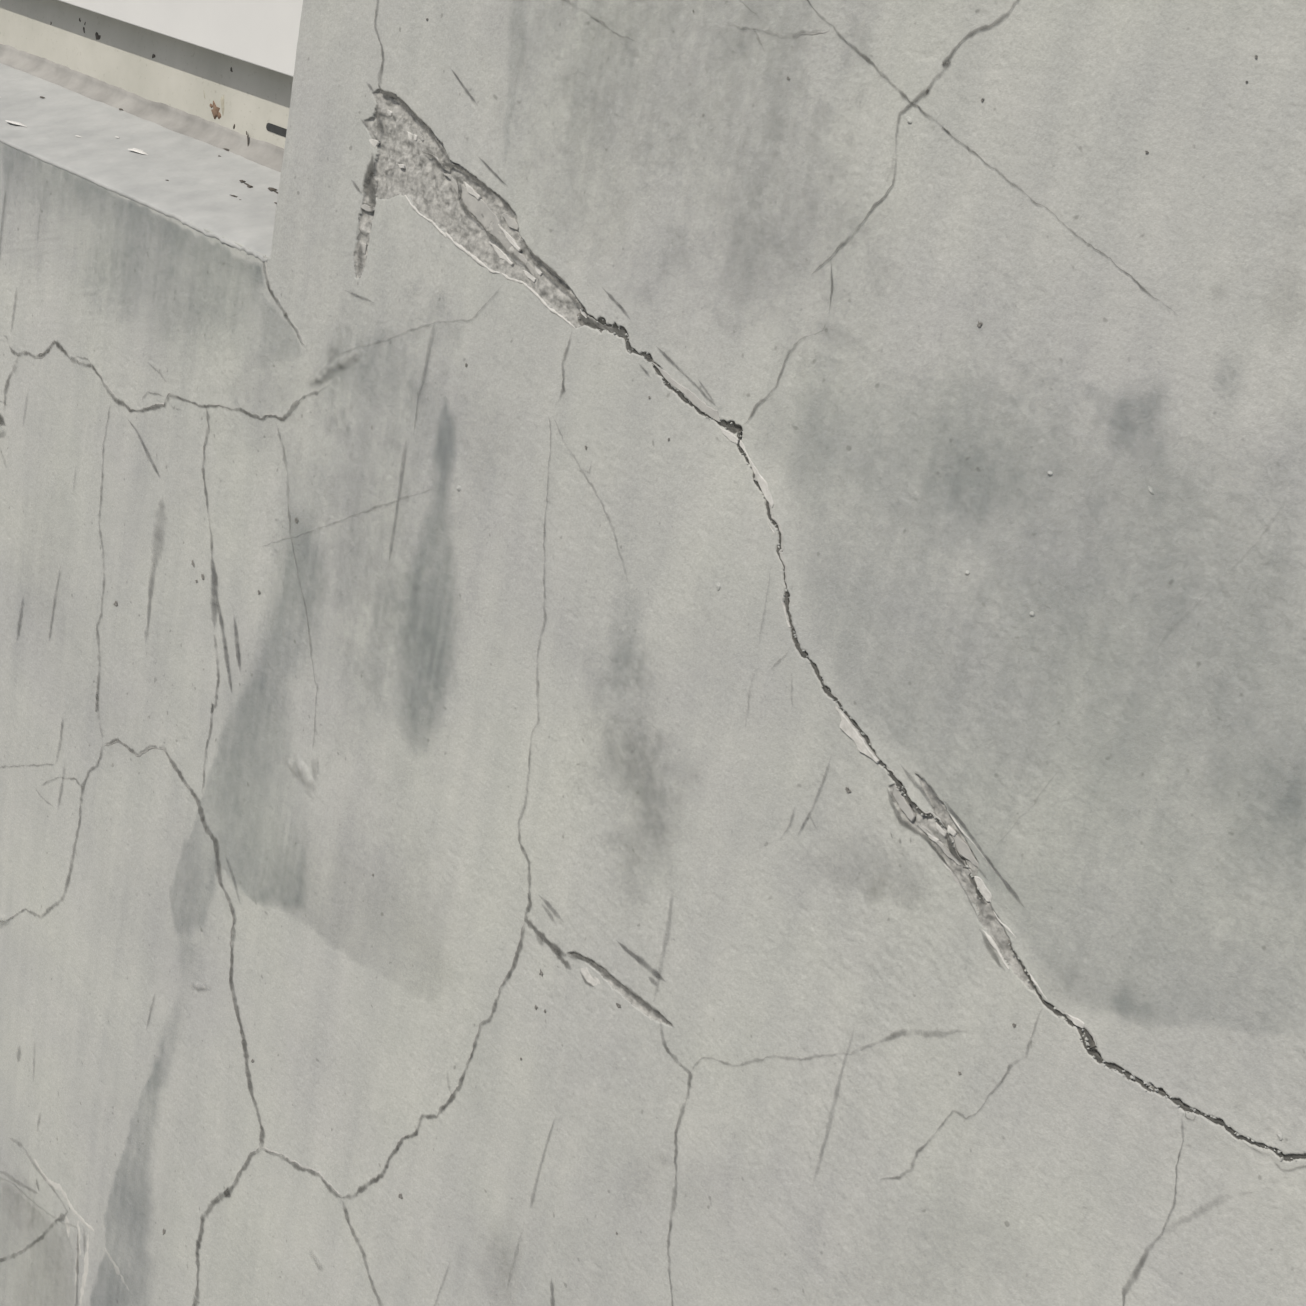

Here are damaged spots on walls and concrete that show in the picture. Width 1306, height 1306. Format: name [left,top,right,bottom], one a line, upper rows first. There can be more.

crack [795,30,874,65]
crack [901,23,994,156]
spalling [354,88,589,328]
crack [866,184,893,217]
crack [1092,246,1147,292]
crack [7,341,303,420]
crack [577,305,988,904]
spalling [835,707,881,763]
spalling [889,775,1047,1000]
crack [97,739,525,1306]
crack [1008,940,1306,1162]
crack [673,1115,681,1161]